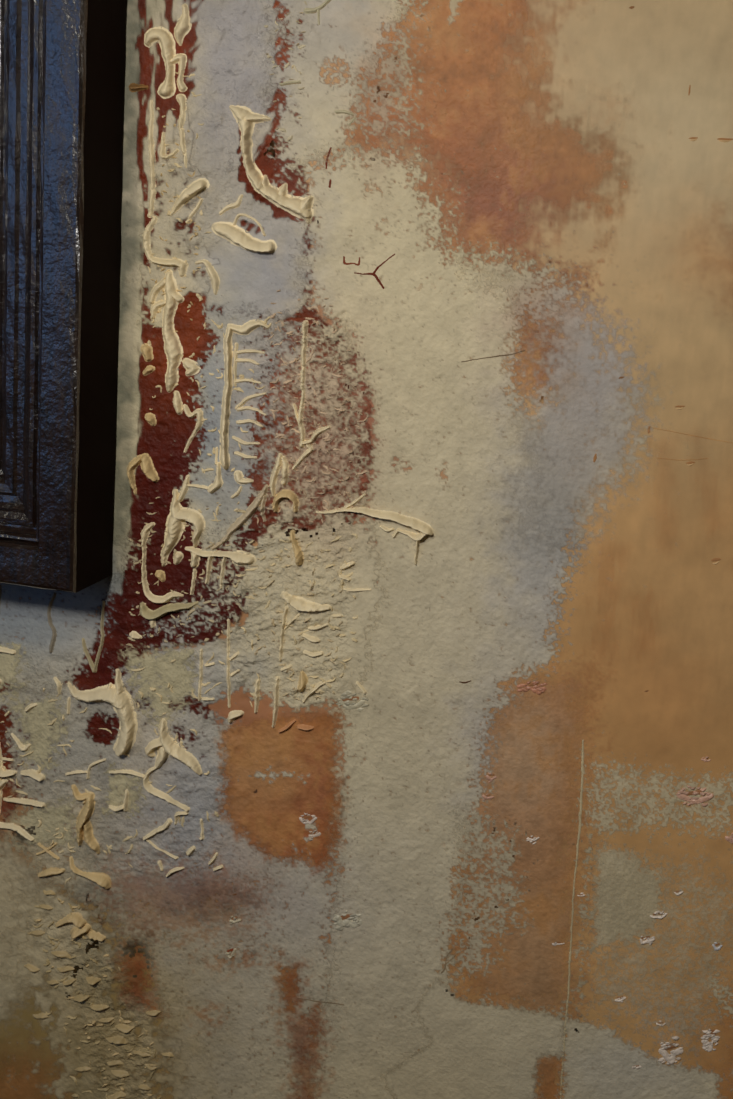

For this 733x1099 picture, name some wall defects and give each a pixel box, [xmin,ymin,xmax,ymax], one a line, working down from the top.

corrosion [336,0,611,265]
crack [343,254,395,289]
peeling [0,836,49,939]
peeling [0,880,182,1099]
peeling [560,1017,723,1099]